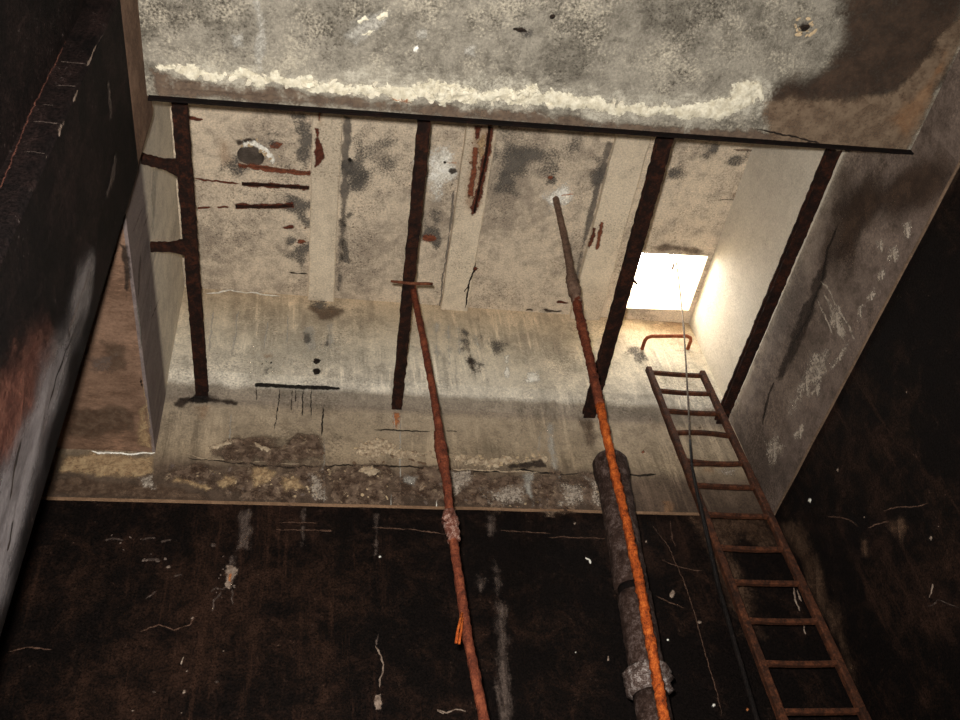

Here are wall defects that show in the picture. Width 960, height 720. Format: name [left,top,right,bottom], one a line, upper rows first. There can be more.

spalling [794,17,817,38]
spalling [195,138,311,191]
rust [314,113,324,167]
damp [149,0,960,277]
rust [588,222,604,250]
crack [762,225,838,425]
damp [817,283,855,340]
damp [788,350,828,413]
damp [764,436,783,464]
peeling [165,433,602,547]
peeling [212,556,238,610]